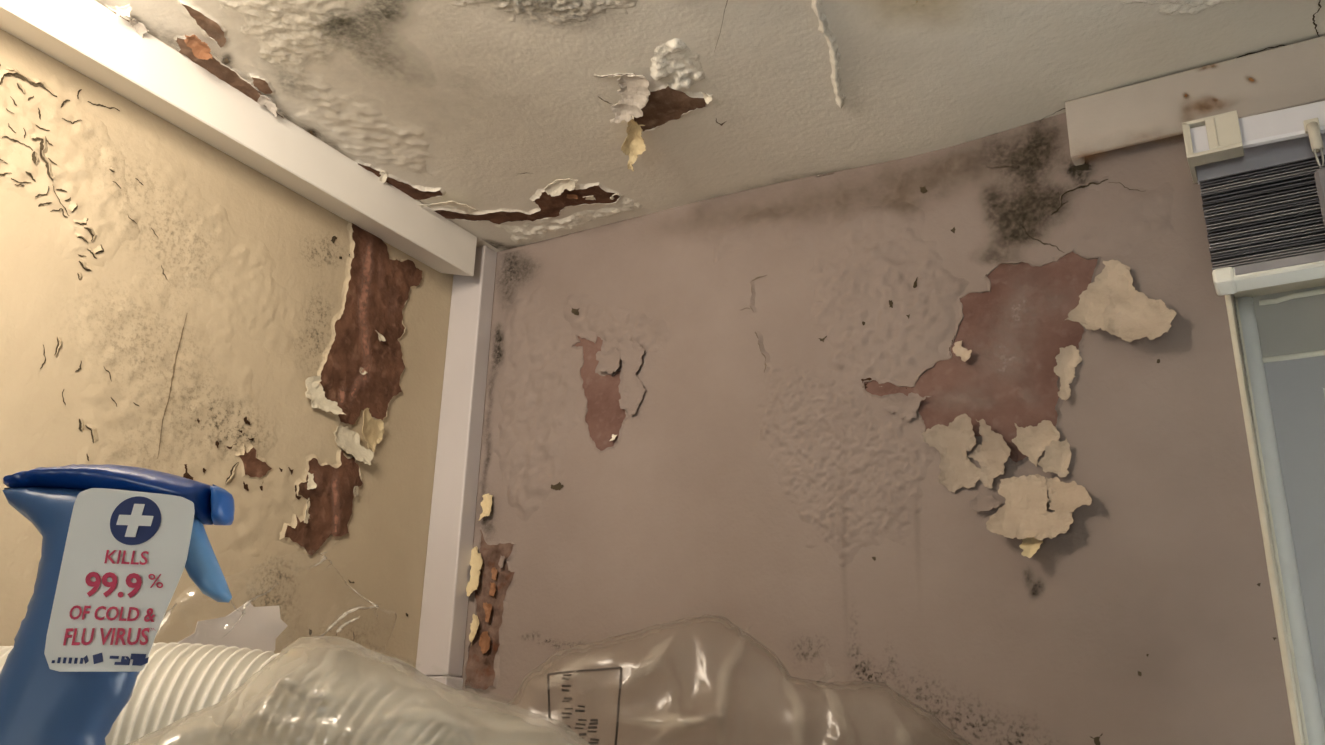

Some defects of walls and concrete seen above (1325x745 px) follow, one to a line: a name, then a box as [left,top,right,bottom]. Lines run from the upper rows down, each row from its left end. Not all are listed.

peeling [164,0,288,119]
mould [321,1,399,40]
peeling [610,38,713,171]
peeling [353,159,625,224]
damp [989,191,1059,239]
damp [1068,161,1092,183]
peeling [215,222,423,559]
peeling [571,333,646,455]
peeling [861,247,1177,558]
peeling [464,493,519,694]